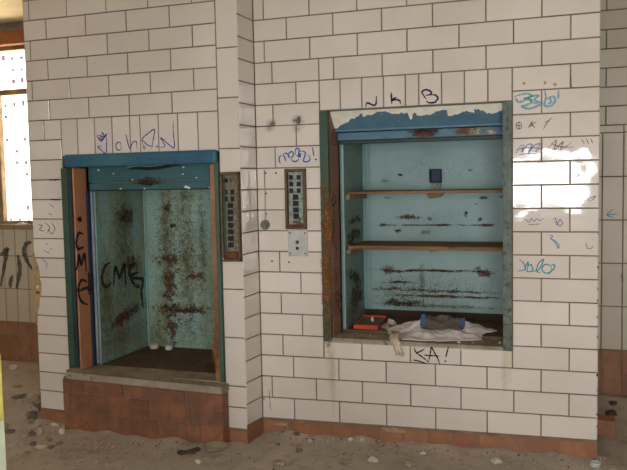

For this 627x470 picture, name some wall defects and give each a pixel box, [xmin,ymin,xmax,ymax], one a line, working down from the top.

peeling [330,103,503,129]
rust [413,129,438,137]
rust [395,214,450,233]
rust [154,204,218,345]
rust [321,187,332,330]
rust [376,266,499,308]